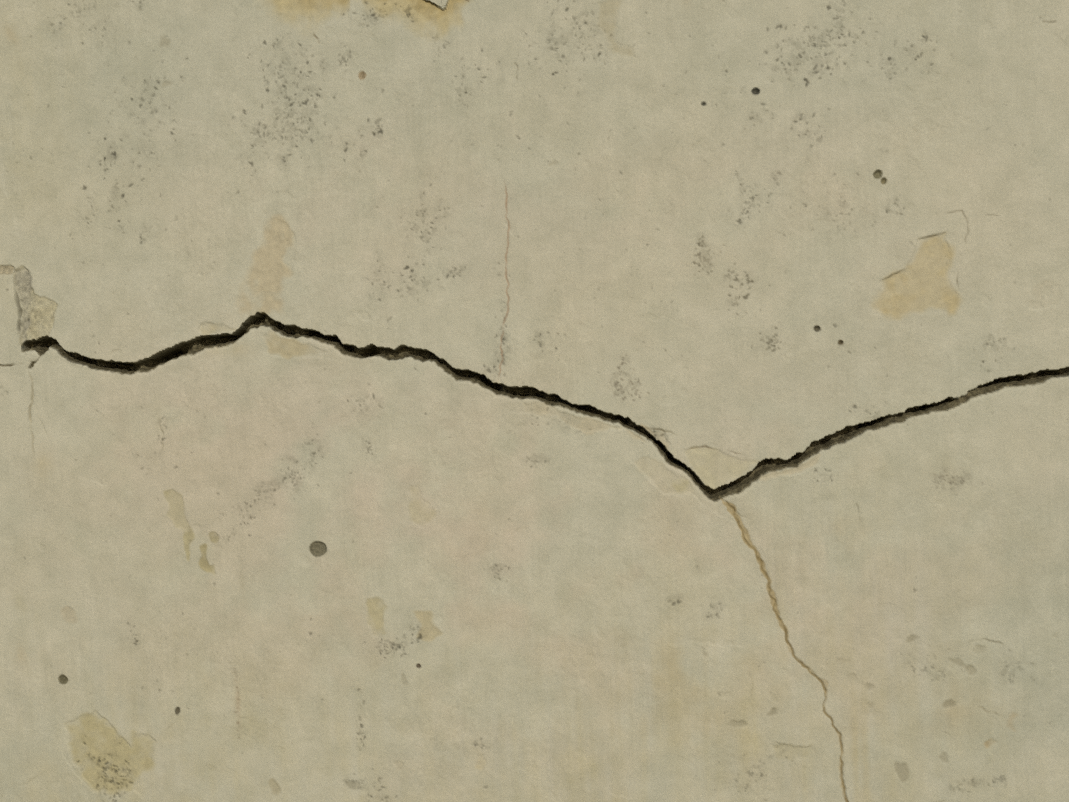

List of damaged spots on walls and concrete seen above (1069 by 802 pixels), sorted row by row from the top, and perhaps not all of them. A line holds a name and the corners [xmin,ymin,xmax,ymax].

peeling [262,0,472,44]
spalling [12,265,59,346]
peeling [870,232,963,321]
crack [0,185,1069,802]
peeling [65,711,156,802]